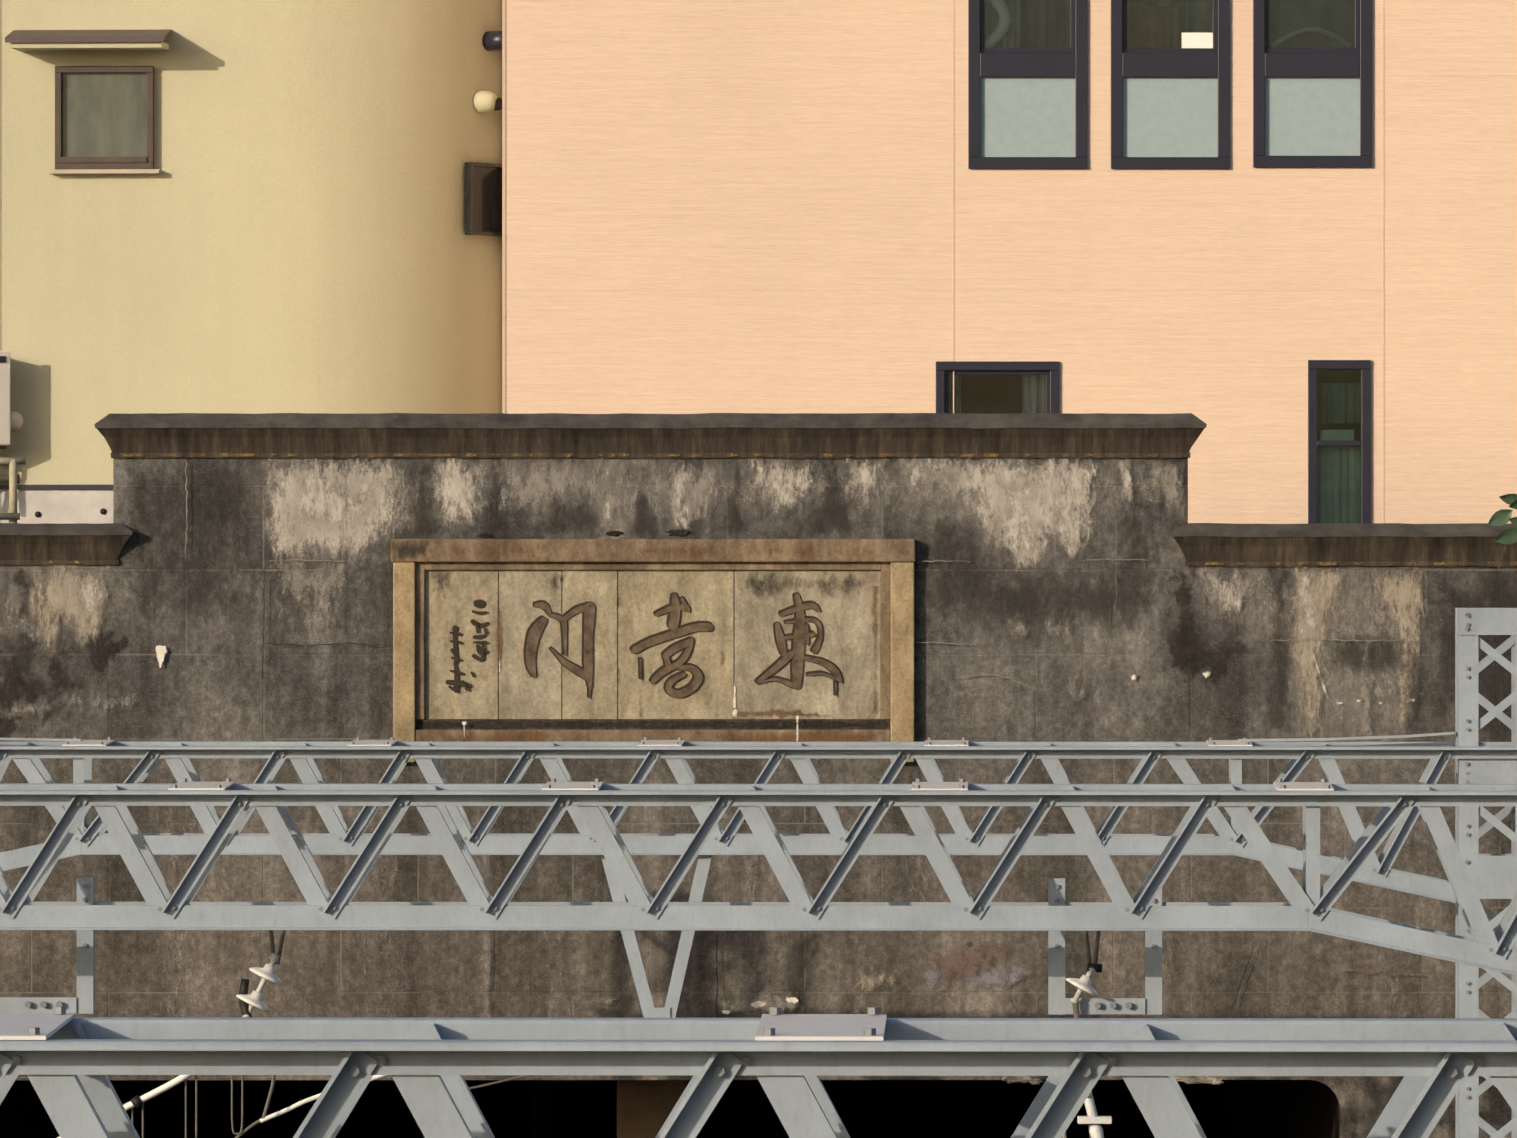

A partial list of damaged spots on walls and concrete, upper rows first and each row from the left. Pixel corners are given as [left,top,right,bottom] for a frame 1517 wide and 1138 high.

water stain [267,458,1183,641]
water stain [0,565,128,741]
water stain [1167,568,1424,733]